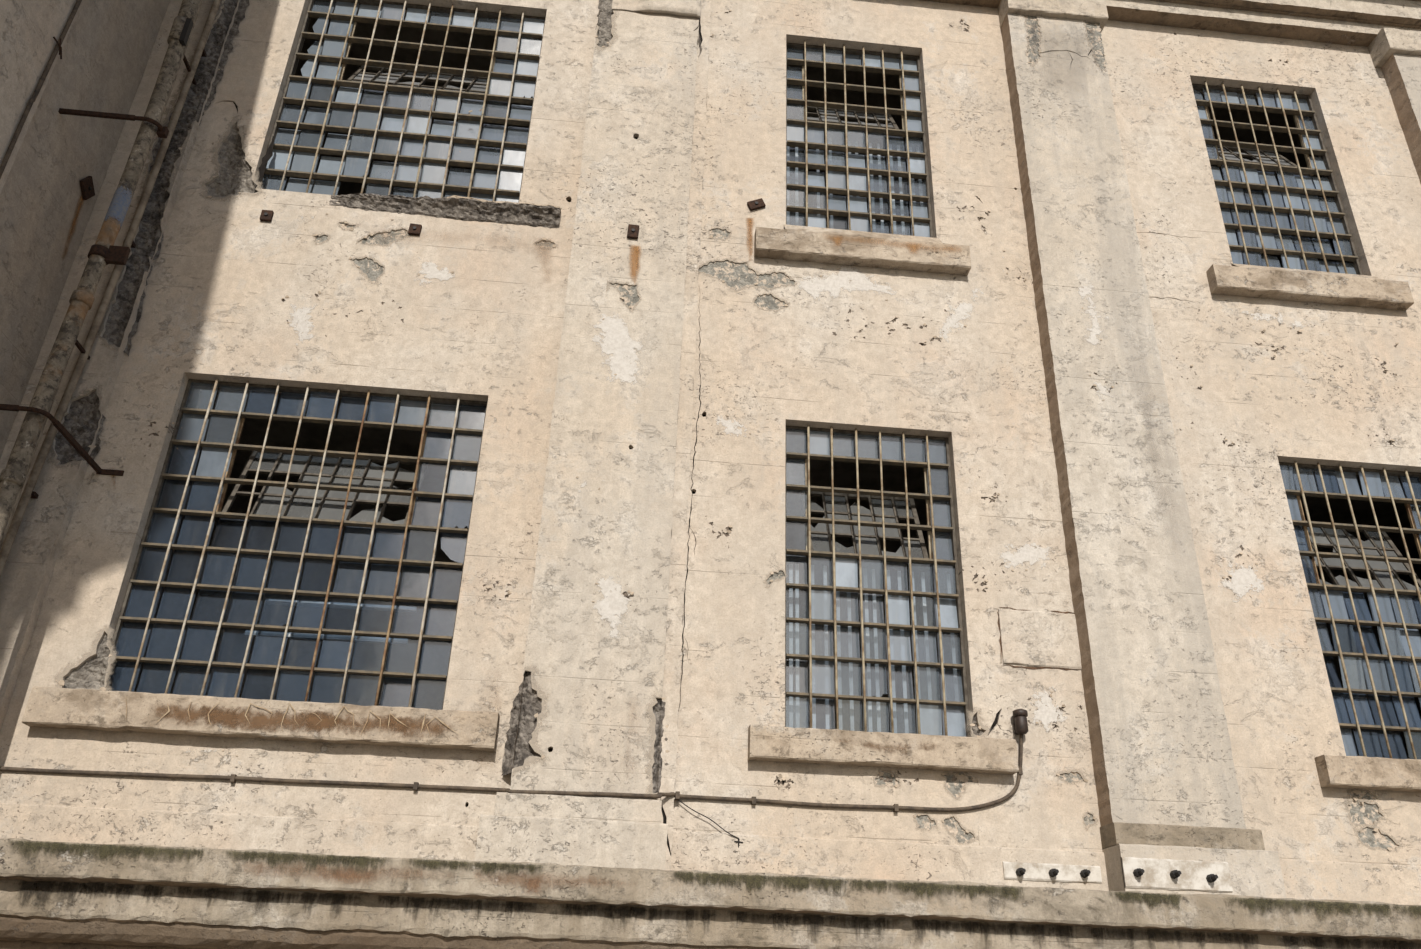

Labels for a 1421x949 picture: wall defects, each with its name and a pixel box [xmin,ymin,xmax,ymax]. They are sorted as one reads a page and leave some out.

spalling [98,0,250,356]
spalling [201,117,275,201]
rust [631,246,639,277]
peeling [698,258,796,312]
crack [678,300,701,712]
rust [157,706,448,735]
spalling [501,667,547,776]
spalling [646,695,669,799]
leakage [245,852,374,870]
leakage [788,877,881,890]
leakage [562,904,710,922]
leakage [914,920,1072,942]